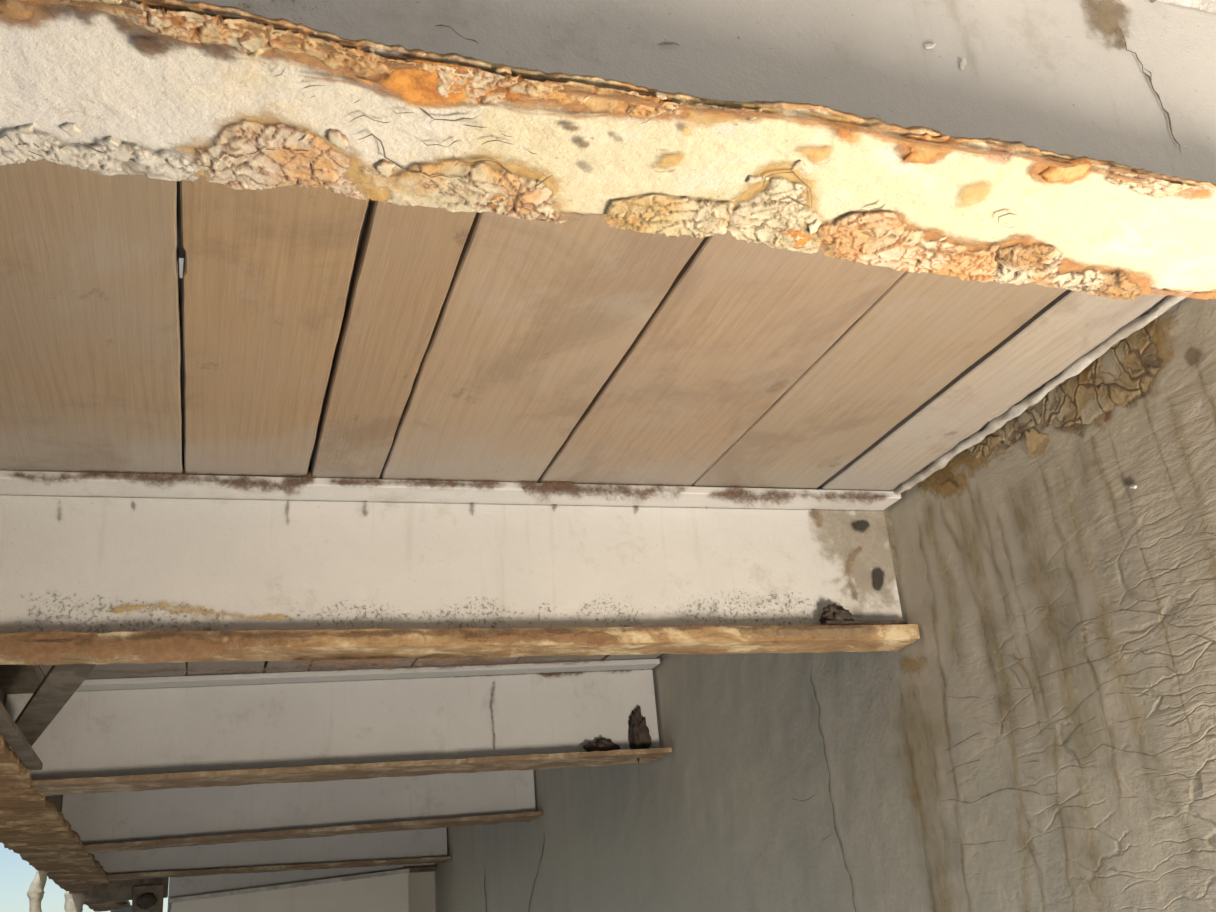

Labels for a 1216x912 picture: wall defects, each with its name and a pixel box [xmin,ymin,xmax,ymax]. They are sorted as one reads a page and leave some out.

corrosion [19,0,1215,199]
crack [1121,30,1180,147]
peeling [0,117,566,224]
peeling [605,160,826,254]
peeling [986,141,1042,164]
leakage [1185,348,1201,365]
leakage [19,593,523,633]
leakage [570,591,815,627]
crack [794,679,856,912]